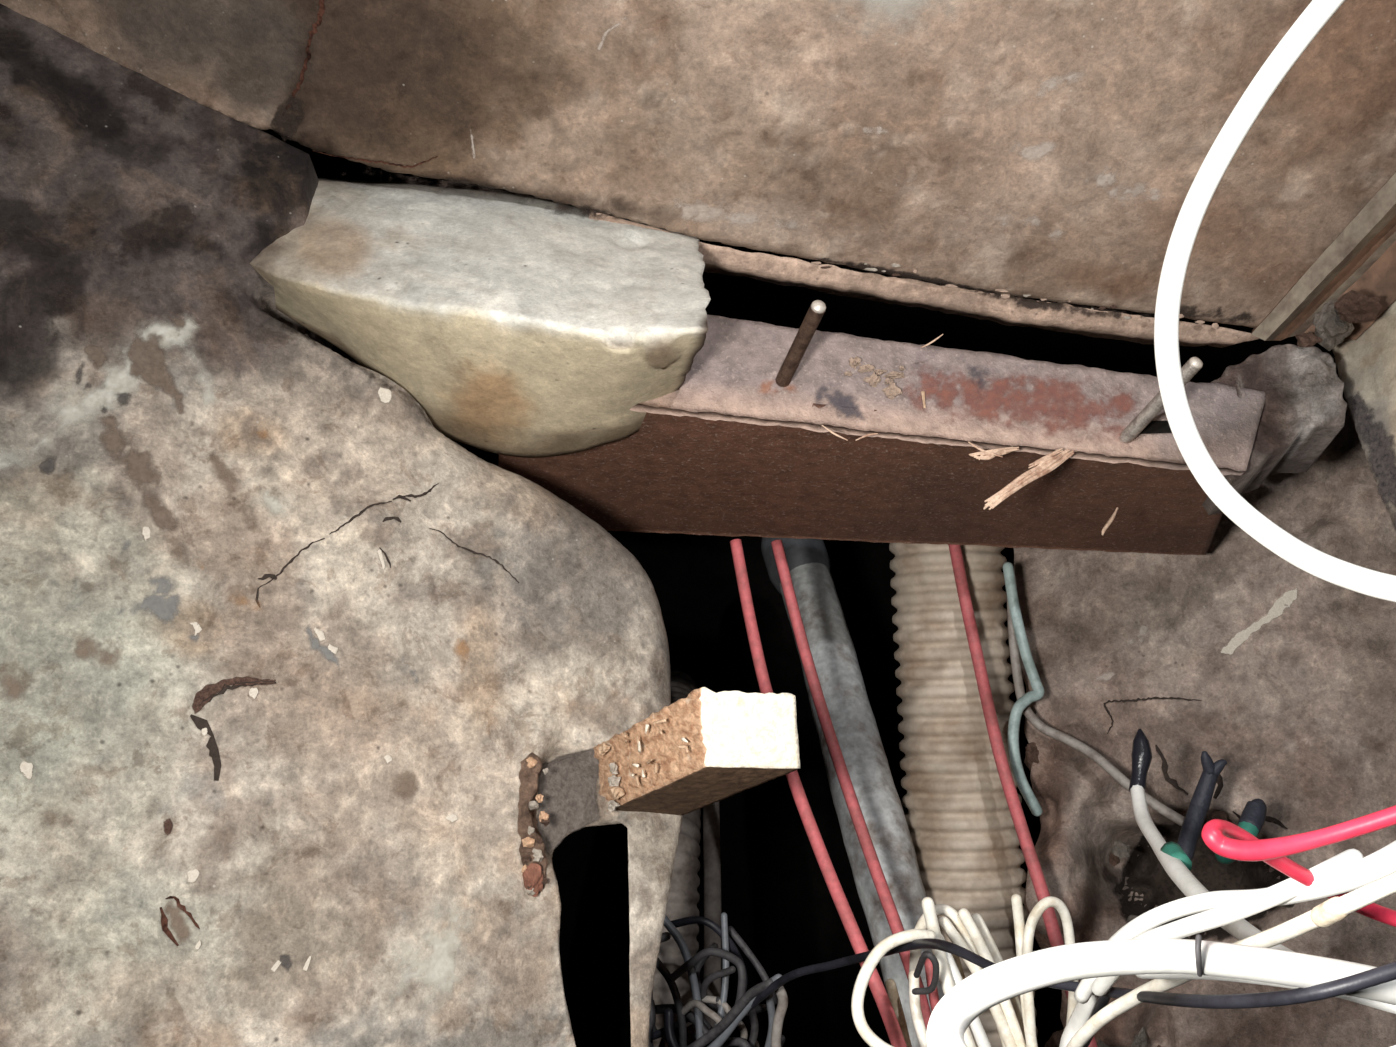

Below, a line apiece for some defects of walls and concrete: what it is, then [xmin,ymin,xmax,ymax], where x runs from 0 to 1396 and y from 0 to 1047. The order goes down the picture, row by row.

crack [271,0,438,168]
peeling [811,258,1155,323]
leakage [53,319,197,553]
rust [911,373,1134,433]
crack [256,483,519,607]